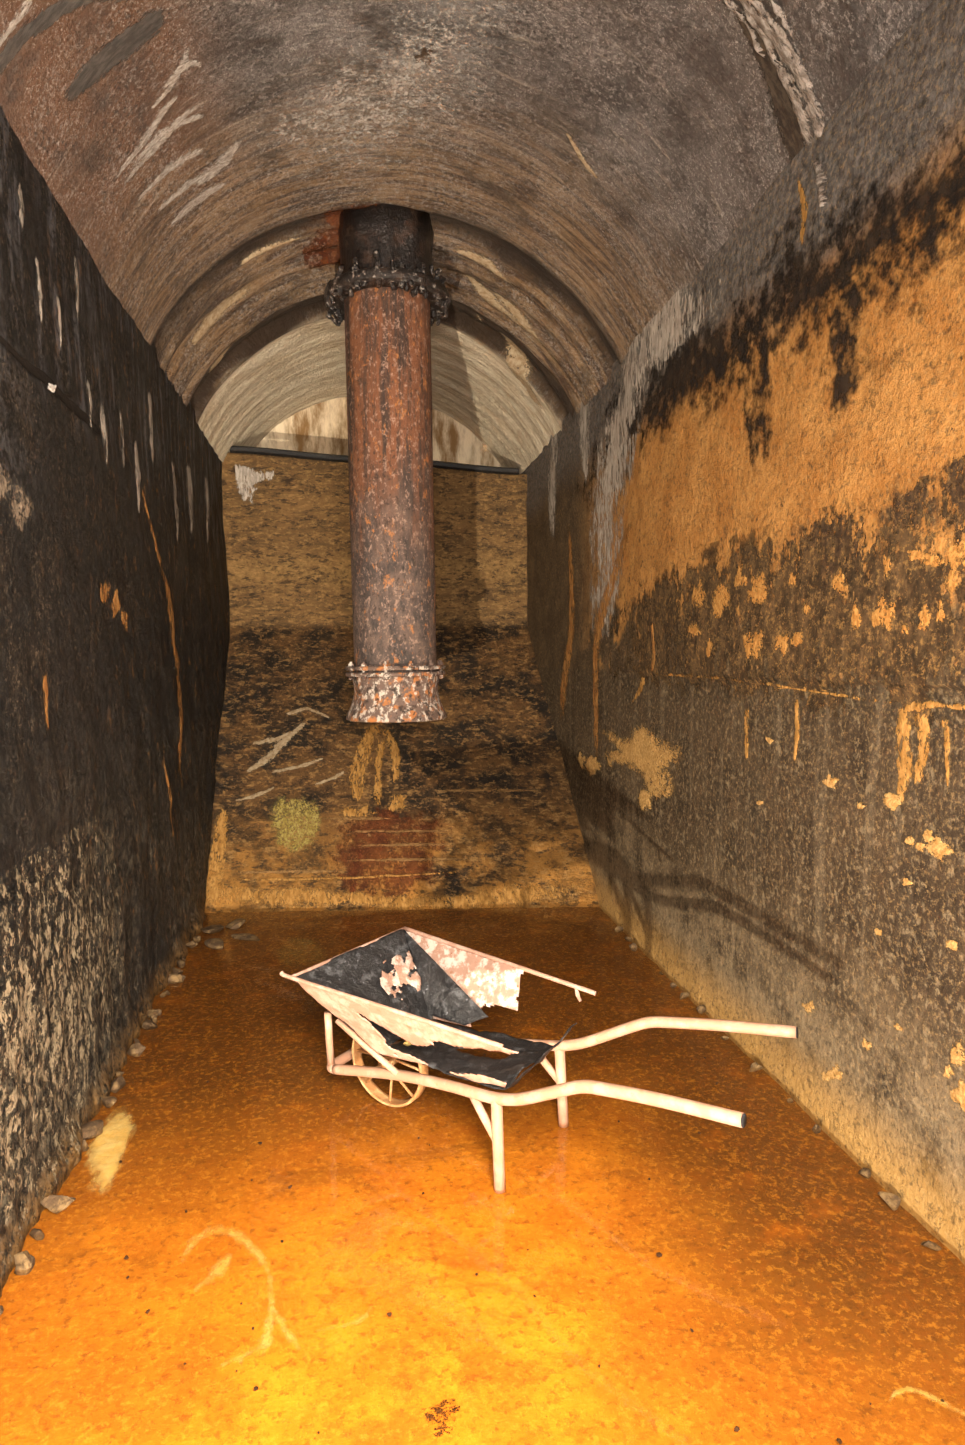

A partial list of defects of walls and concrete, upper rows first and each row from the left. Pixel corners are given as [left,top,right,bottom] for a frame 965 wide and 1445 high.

water stain [0,0,128,75]
water stain [116,48,204,183]
water stain [272,5,504,164]
peeling [724,0,827,213]
water stain [35,257,79,346]
water stain [138,140,242,227]
corrosion [302,204,377,269]
water stain [87,380,154,512]
water stain [171,462,209,543]
water stain [579,278,721,634]
corrosion [100,582,128,630]
corrosion [142,489,183,836]